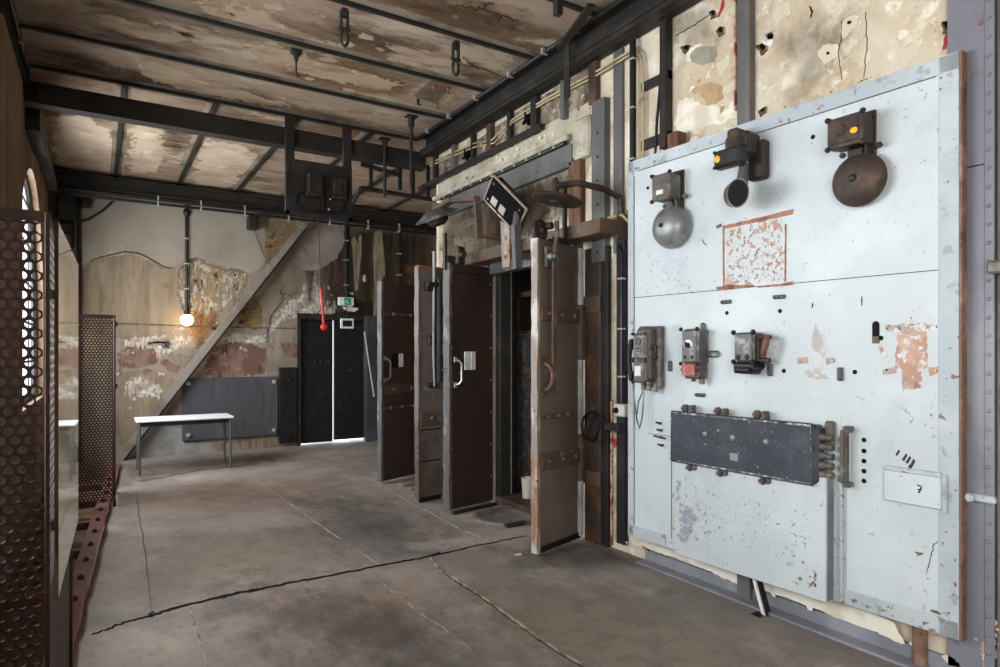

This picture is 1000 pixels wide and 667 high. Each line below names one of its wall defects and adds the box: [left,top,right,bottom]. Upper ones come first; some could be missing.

water stain [44,49,174,87]
water stain [101,30,178,51]
water stain [288,69,402,93]
water stain [338,29,431,51]
peeling [673,54,744,142]
flaking render [709,10,725,37]
peeling [755,0,791,56]
crack [838,13,868,80]
flaking render [116,257,358,410]
crack [92,464,588,667]